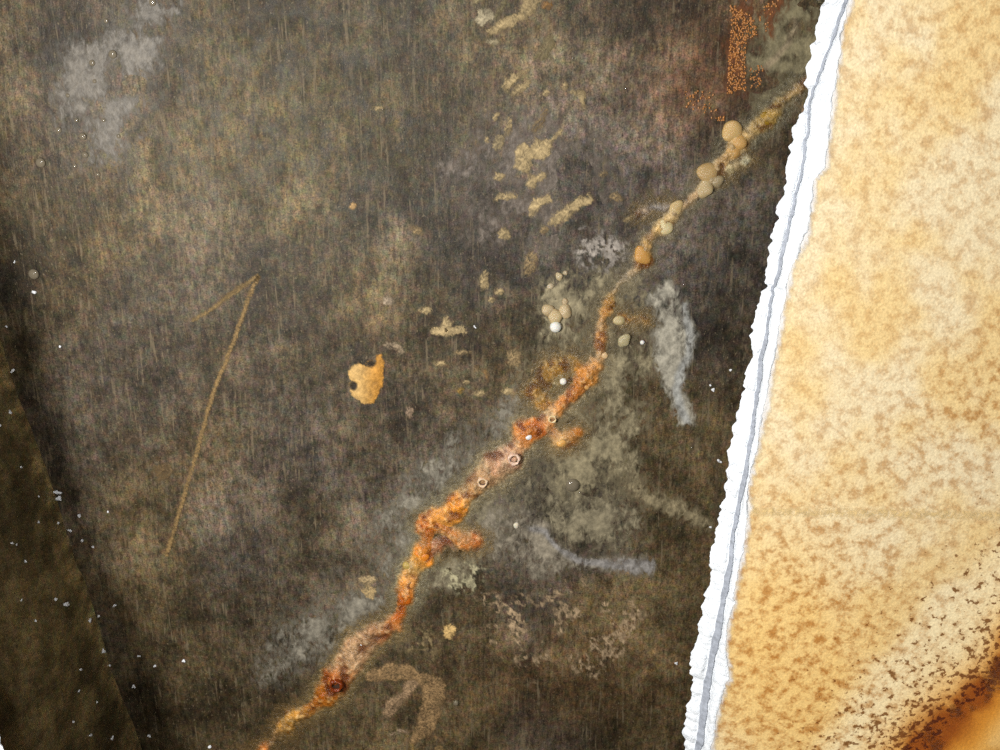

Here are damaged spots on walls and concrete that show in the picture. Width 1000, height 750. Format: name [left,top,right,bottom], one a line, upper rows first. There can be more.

water stain [48,0,183,167]
rust [685,90,725,121]
rust [721,0,784,94]
water stain [438,106,622,252]
spalling [348,342,405,404]
peeling [431,316,467,337]
peeling [480,270,504,303]
peeling [507,349,521,367]
crack [237,73,808,750]
water stain [426,227,712,666]
water stain [714,0,1000,750]
water stain [567,600,642,678]